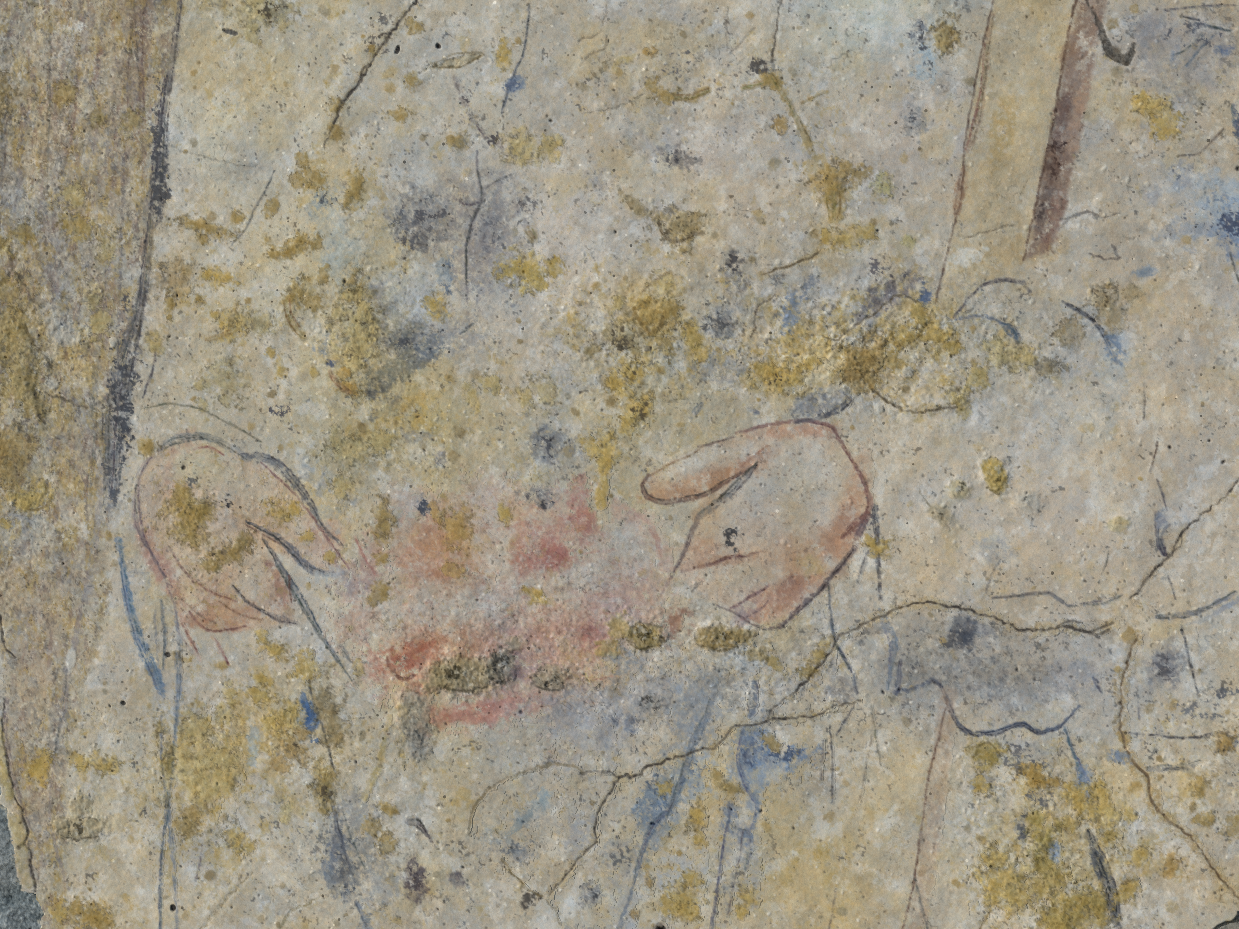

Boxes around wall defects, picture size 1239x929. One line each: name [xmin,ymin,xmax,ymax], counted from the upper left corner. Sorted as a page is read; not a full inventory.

crack [321,0,419,155]
crack [0,613,17,659]
crack [467,476,1239,926]
crack [1,696,38,894]
spalling [0,787,44,929]
spalling [1215,915,1239,929]